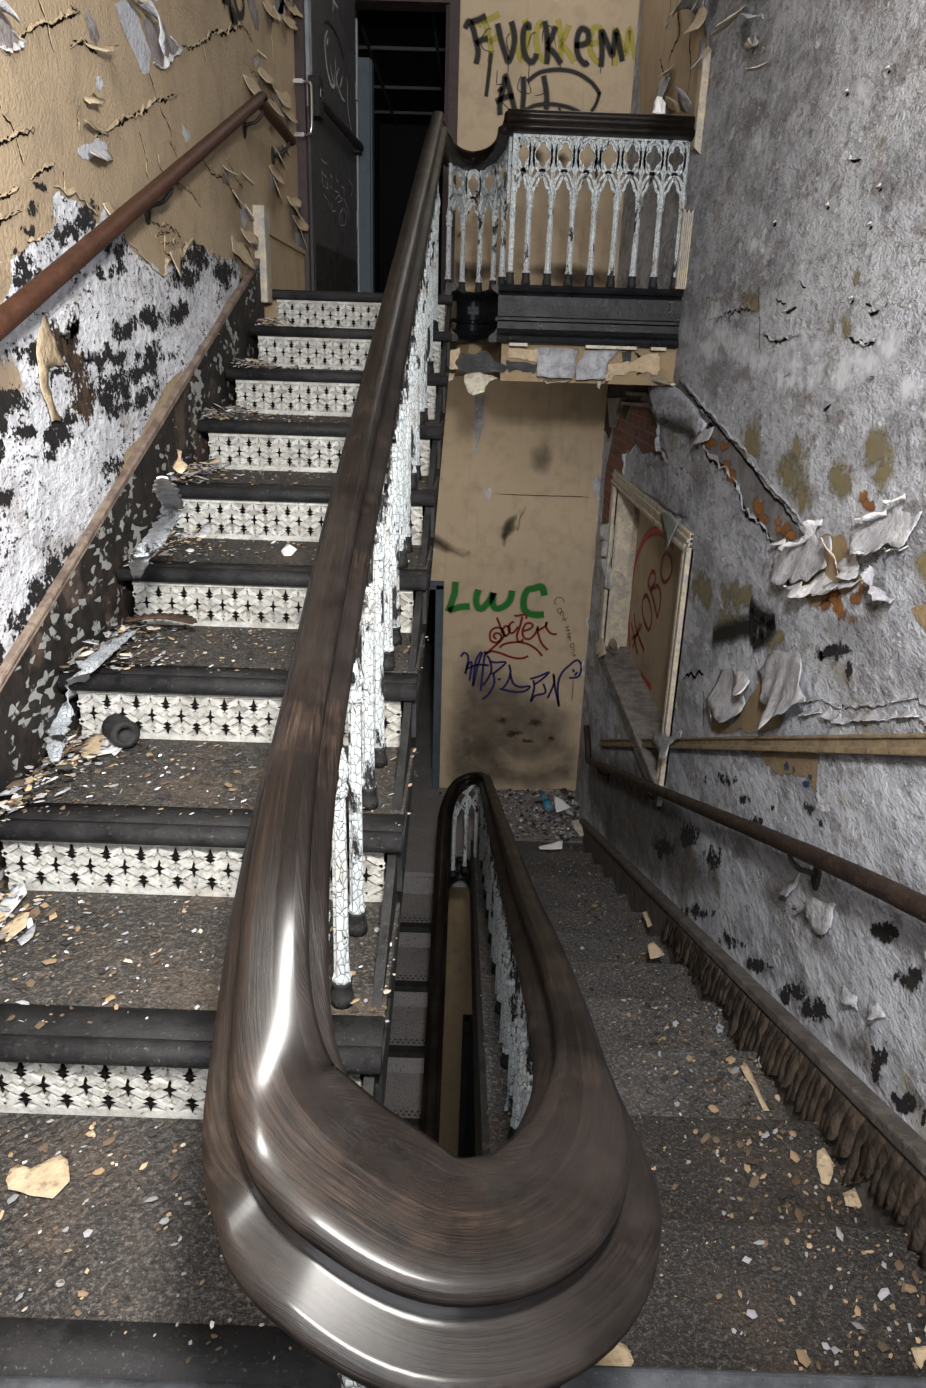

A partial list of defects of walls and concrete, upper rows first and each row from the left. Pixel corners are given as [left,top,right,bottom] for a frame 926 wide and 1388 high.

peeling [0,0,26,56]
peeling [83,0,183,74]
peeling [665,0,767,71]
peeling [0,49,309,664]
flaking render [448,343,707,590]
crack [676,376,803,546]
peeling [769,494,922,607]
peeling [705,649,926,734]
peeling [0,883,36,946]
peeling [775,873,836,935]
peeling [642,911,926,1269]
peeling [911,1326,926,1369]